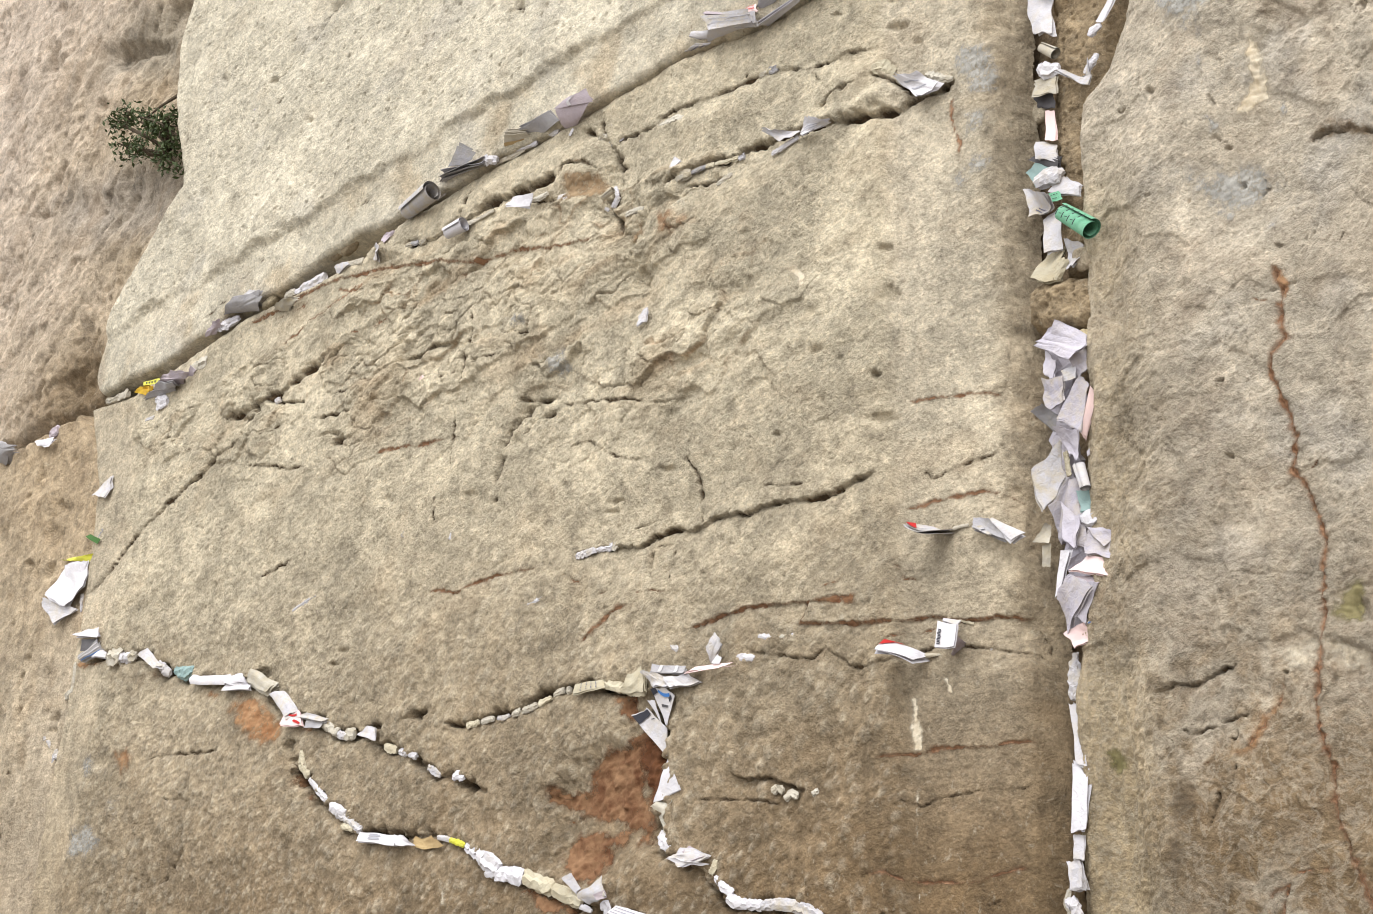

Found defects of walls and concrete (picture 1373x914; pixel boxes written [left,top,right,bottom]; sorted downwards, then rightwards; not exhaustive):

crack [431,569,529,594]
crack [572,460,705,641]
crack [739,479,864,517]
crack [1185,266,1373,914]
rust [545,695,667,884]